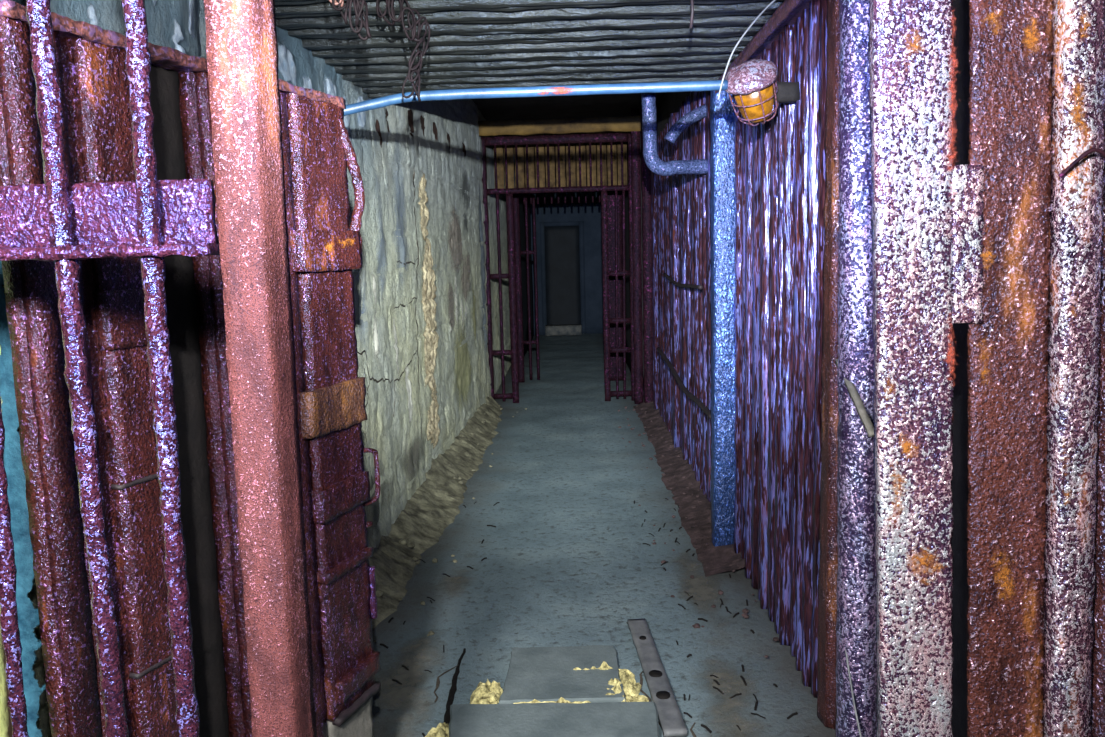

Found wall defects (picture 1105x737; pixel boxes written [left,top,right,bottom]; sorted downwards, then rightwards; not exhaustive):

rust [1024,19,1040,48]
rust [1069,86,1086,131]
rust [901,439,918,455]
peeling [0,261,46,737]
rust [911,551,942,584]
rust [994,559,1014,597]
crack [434,648,466,724]